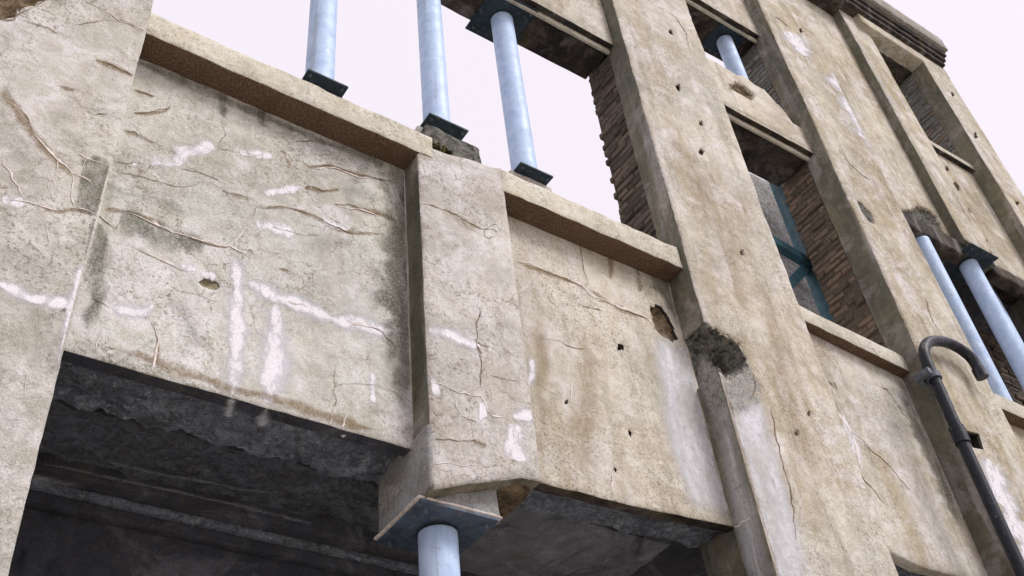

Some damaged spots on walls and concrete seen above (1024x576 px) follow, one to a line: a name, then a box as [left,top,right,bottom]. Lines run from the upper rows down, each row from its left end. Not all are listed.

crack [97,60,153,97]
water stain [80,156,109,242]
efflorescence [151,139,216,169]
crack [1,93,403,348]
spalling [903,207,940,230]
efflorescence [0,267,83,363]
spalling [199,271,220,290]
water stain [225,173,480,417]
crack [516,247,650,321]
crack [431,309,605,466]
spalling [650,307,762,421]
crack [770,404,797,540]